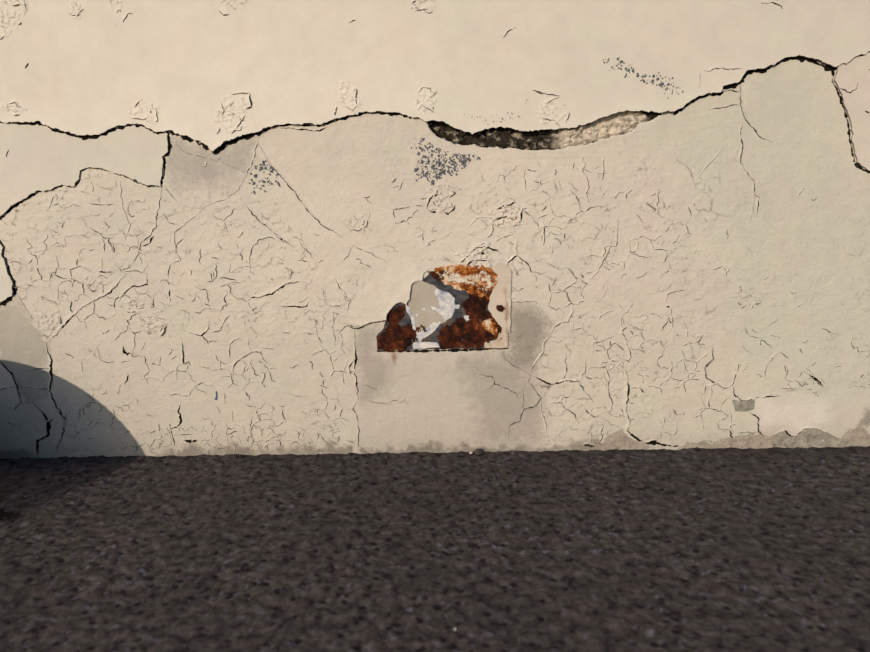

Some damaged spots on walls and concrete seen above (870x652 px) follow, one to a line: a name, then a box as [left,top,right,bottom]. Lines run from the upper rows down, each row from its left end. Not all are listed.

peeling [211,91,253,137]
spalling [414,86,653,150]
peeling [834,52,870,171]
peeling [0,98,169,217]
peeling [0,244,13,302]
peeling [345,260,431,326]
rust [376,304,427,352]
crack [0,51,870,455]
rust [428,264,505,350]
peeling [453,240,512,333]
spalling [733,400,755,412]
spalling [678,427,870,450]